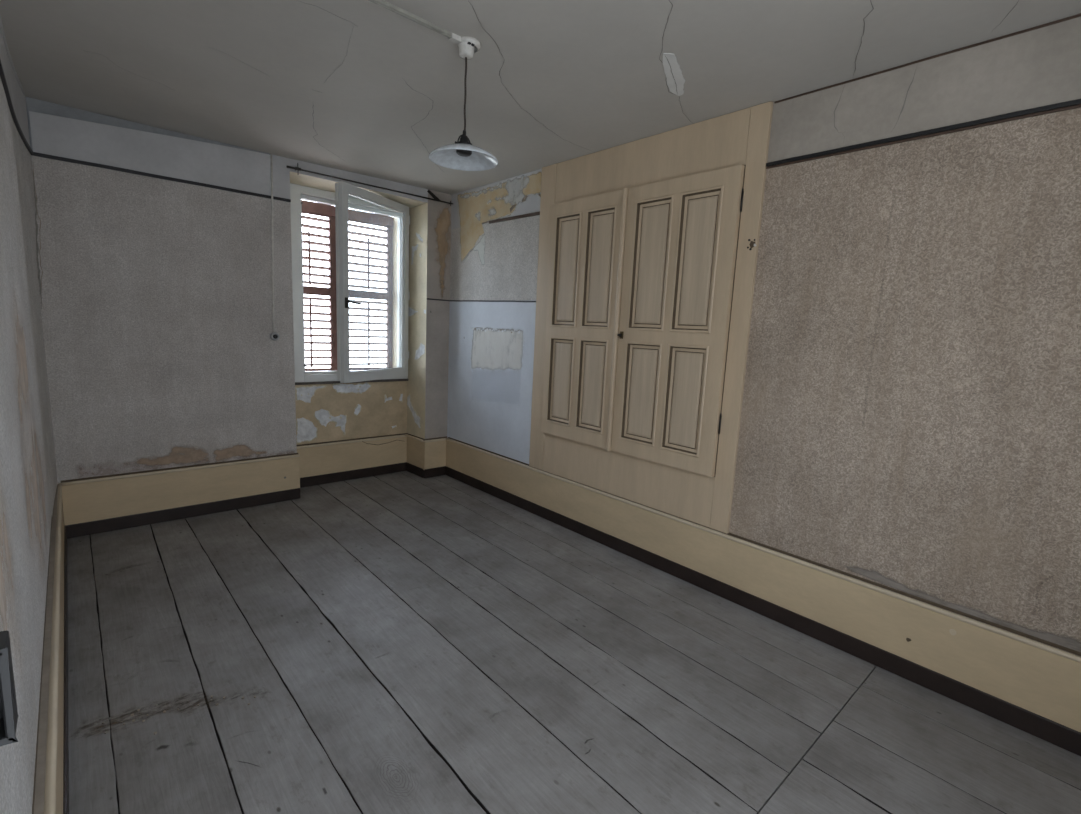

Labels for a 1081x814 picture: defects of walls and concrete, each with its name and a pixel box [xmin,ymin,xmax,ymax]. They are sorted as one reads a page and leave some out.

crack [659,0,694,124]
crack [834,0,874,143]
peeling [295,382,371,444]